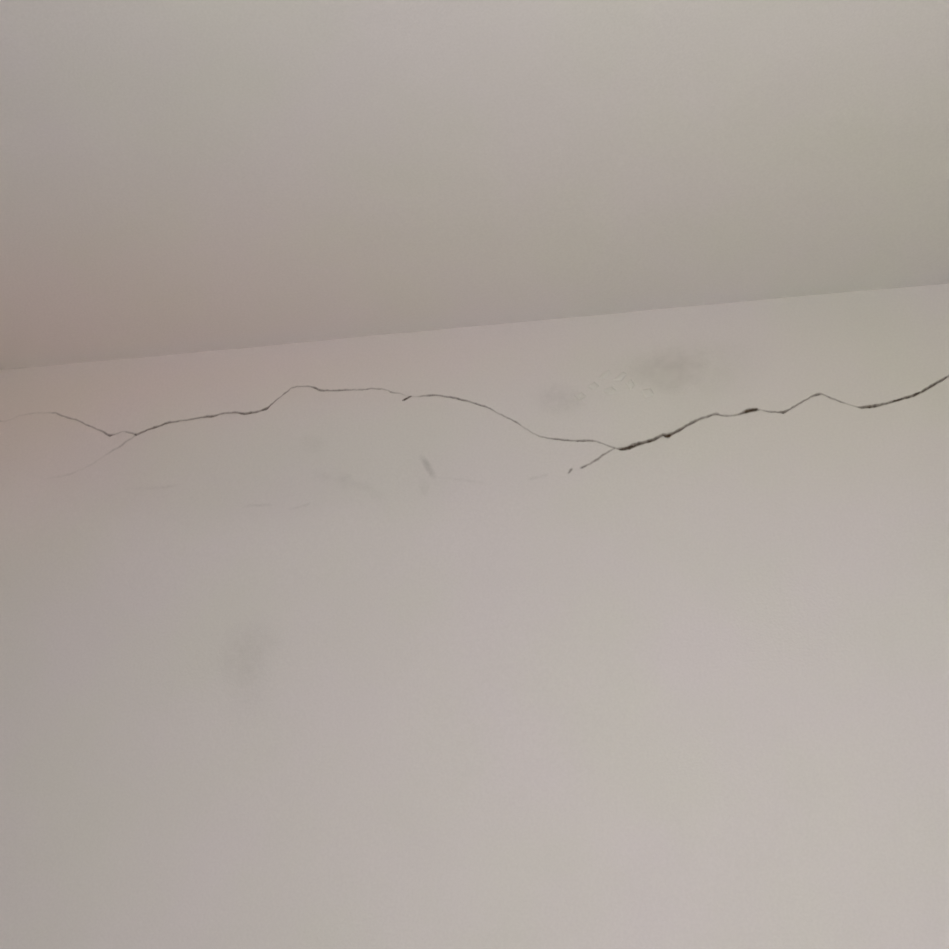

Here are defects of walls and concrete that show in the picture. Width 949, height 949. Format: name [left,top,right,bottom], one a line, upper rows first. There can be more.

crack [863,377,947,408]
crack [619,414,718,450]